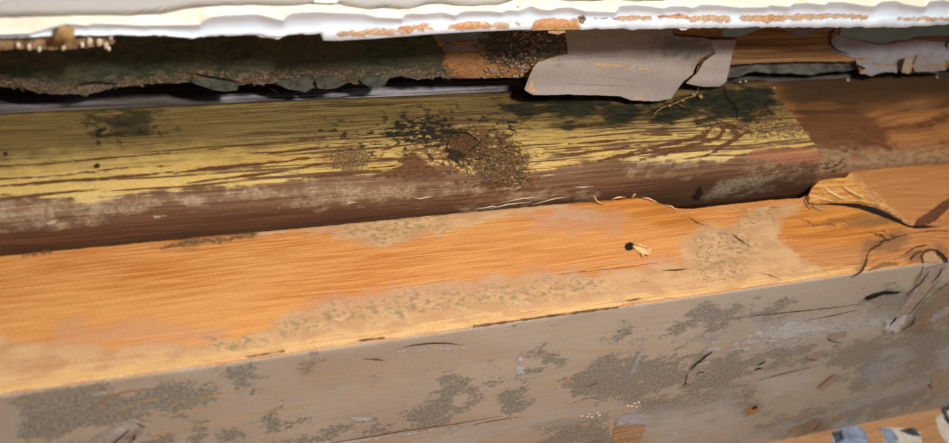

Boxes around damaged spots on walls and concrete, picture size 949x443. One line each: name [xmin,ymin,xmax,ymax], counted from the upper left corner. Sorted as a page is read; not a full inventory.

water stain [0,34,448,95]
water stain [475,30,567,65]
peeling [432,24,949,101]
crack [0,137,399,201]
water stain [379,117,461,145]
crack [542,133,674,160]
crack [823,203,946,277]